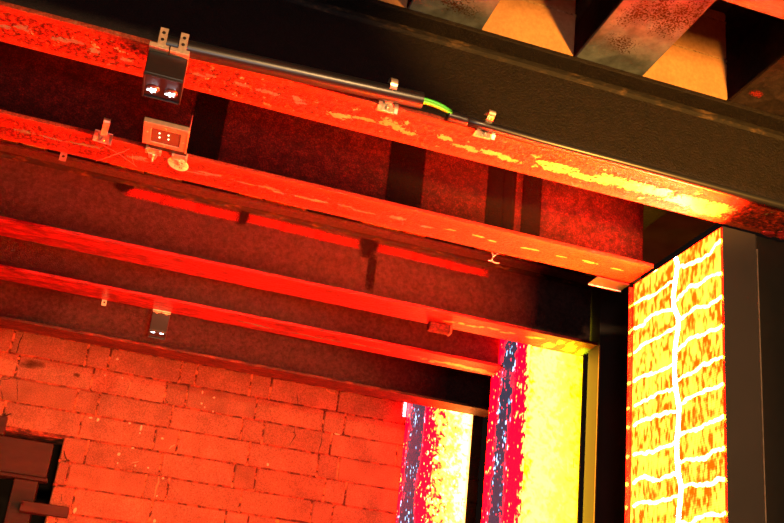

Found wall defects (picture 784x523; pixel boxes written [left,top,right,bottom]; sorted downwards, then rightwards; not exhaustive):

rust [605,0,710,53]
peeling [327,111,416,135]
peeling [437,134,524,164]
peeling [535,160,738,218]
rust [761,231,784,240]